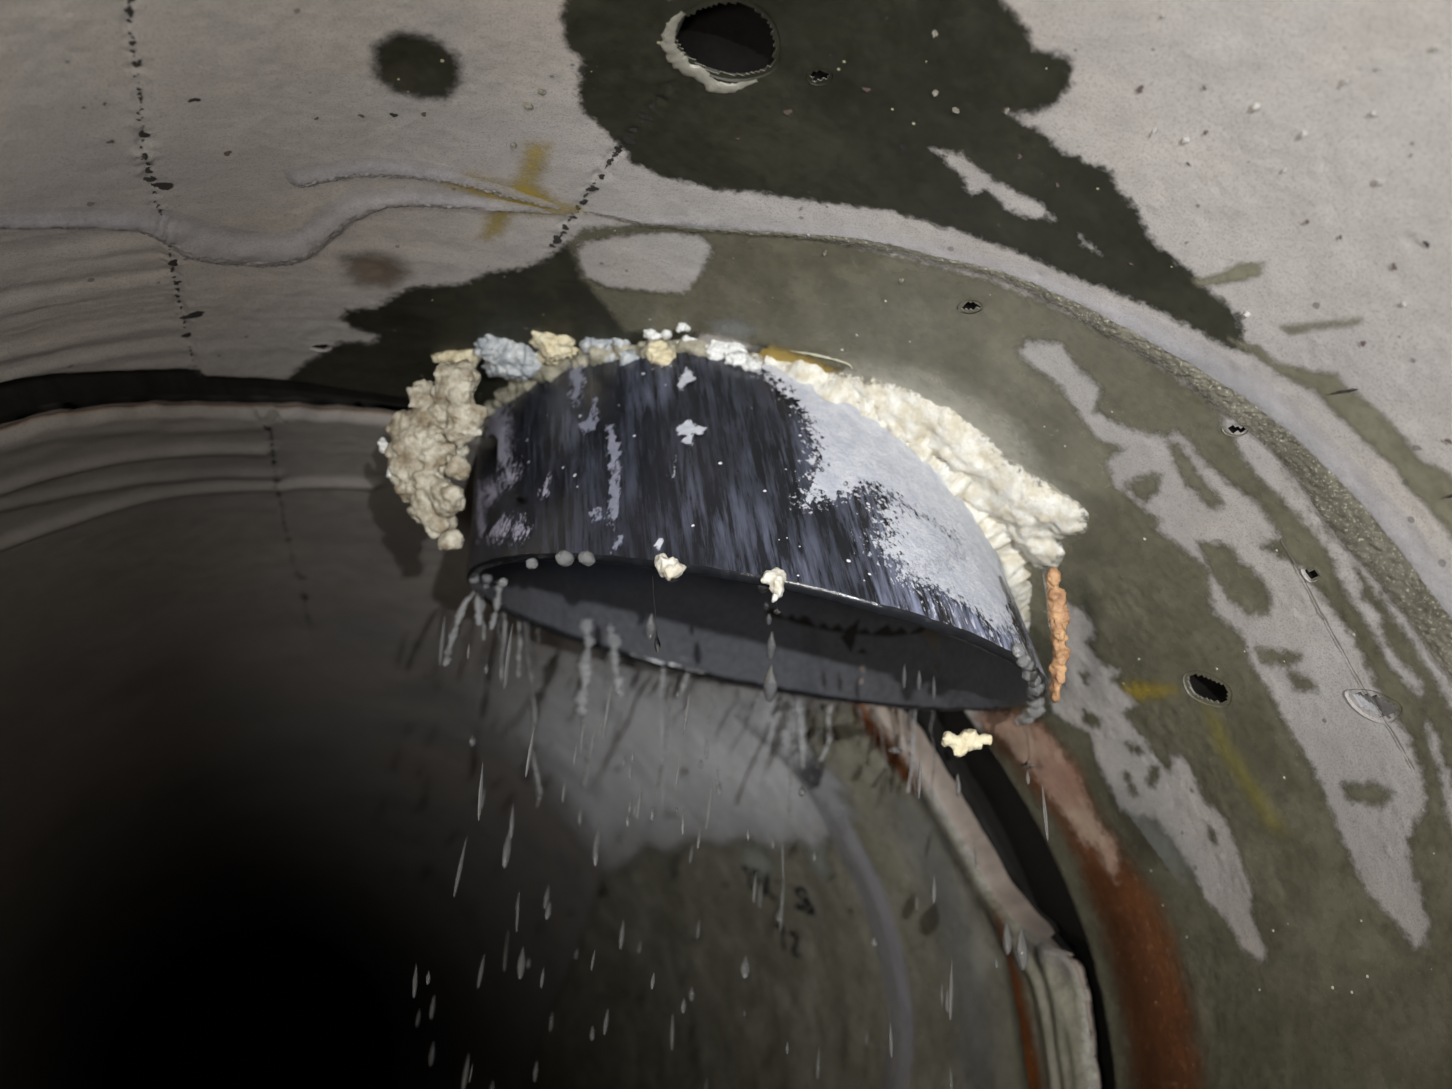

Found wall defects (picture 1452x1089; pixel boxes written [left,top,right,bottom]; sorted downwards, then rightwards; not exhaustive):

crack [124,0,204,377]
damp [374,33,459,98]
damp [560,0,1452,533]
damp [282,223,1452,1089]
corrosion [856,704,922,794]
corrosion [976,710,1201,1089]